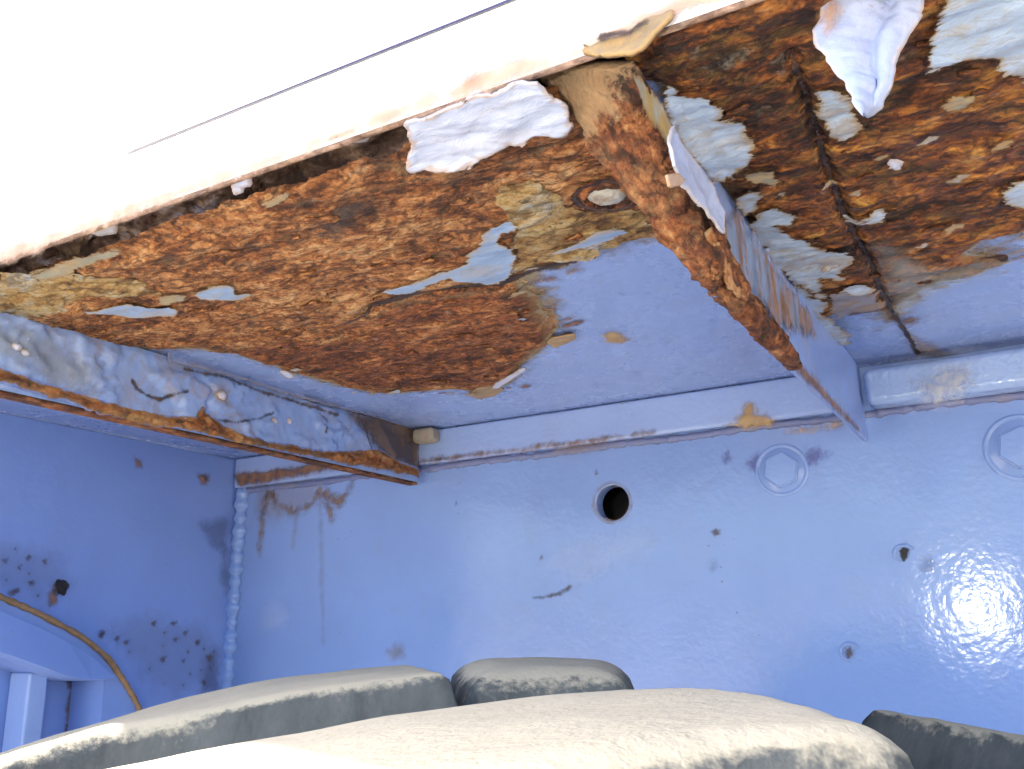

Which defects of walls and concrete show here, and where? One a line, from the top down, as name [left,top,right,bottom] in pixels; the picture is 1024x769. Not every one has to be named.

peeling [925,0,1024,84]
peeling [812,0,924,142]
peeling [887,159,904,171]
peeling [231,175,253,195]
peeling [1002,181,1024,209]
peeling [92,225,118,236]
corrosion [0,0,1024,430]
peeling [632,73,876,346]
peeling [843,208,887,225]
peeling [469,386,504,400]
corrosion [0,367,607,535]